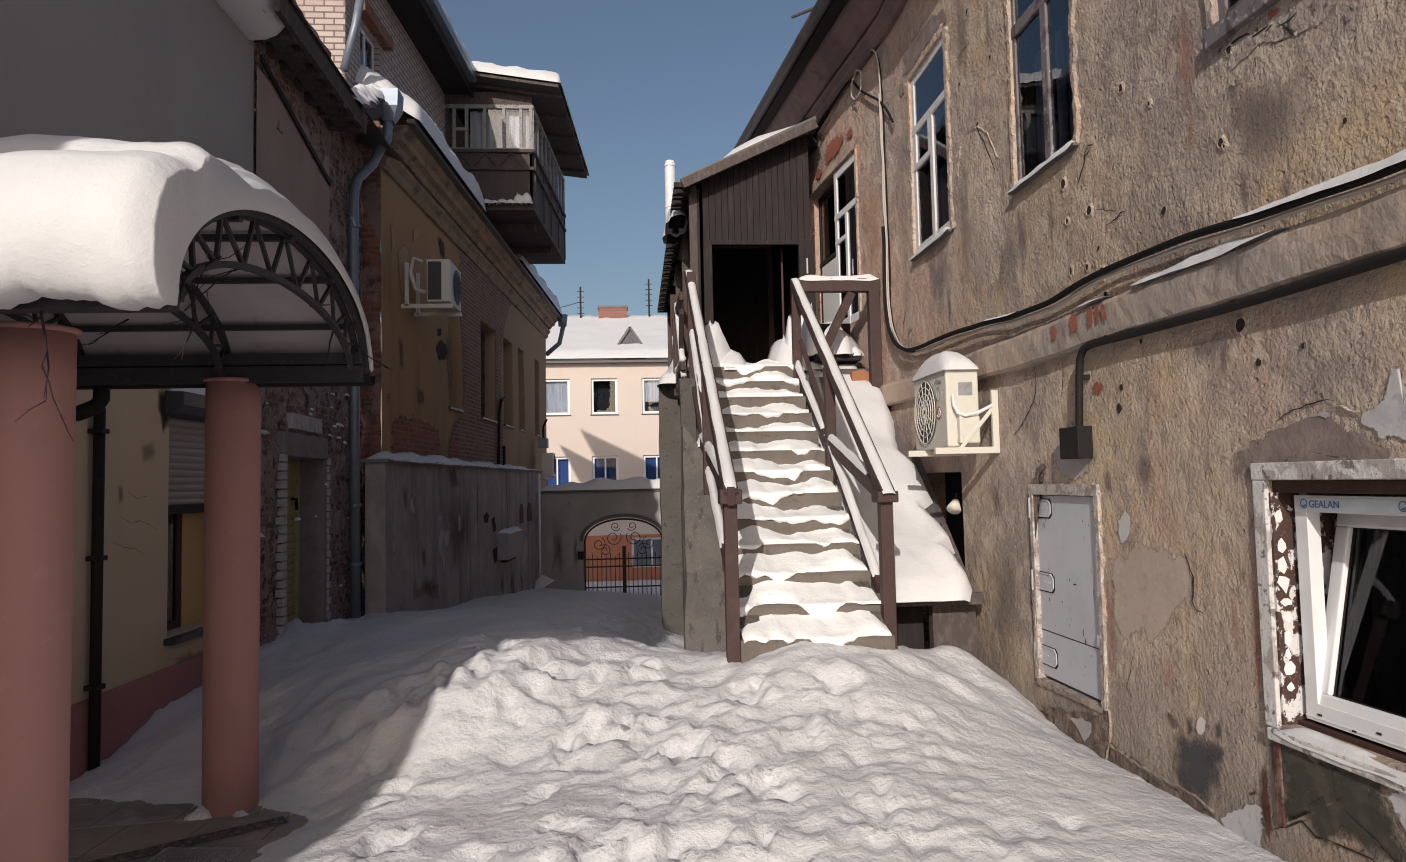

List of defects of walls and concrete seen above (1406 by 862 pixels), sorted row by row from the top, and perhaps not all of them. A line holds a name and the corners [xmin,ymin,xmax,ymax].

spalling [1219,0,1352,86]
spalling [386,249,511,465]
spalling [1224,405,1390,482]
peeling [1274,510,1296,692]
damp [1175,717,1223,800]